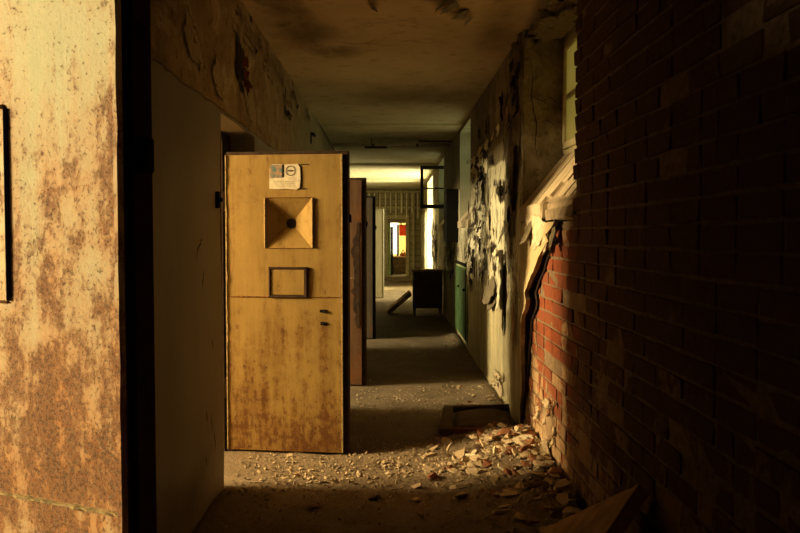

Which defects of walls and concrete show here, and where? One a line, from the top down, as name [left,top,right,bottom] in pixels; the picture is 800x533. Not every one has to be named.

flaking render [236,33,253,102]
peeling [431,0,578,331]
spalling [533,398,556,448]